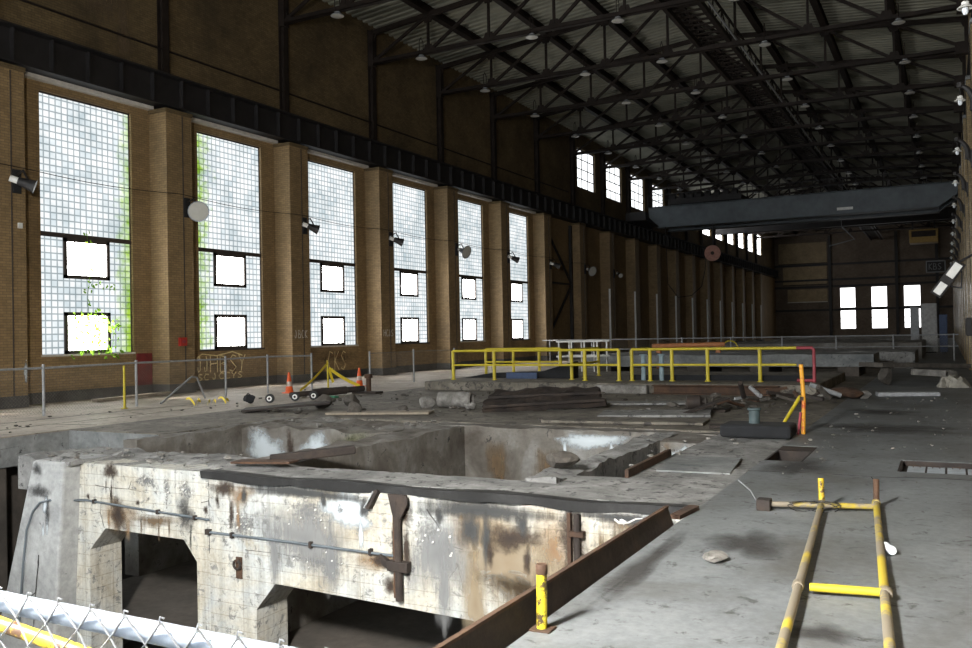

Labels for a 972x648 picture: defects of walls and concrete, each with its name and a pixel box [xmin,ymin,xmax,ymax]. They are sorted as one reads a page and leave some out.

rust [107,499,129,535]
rust [362,530,409,568]
rust [456,512,583,623]